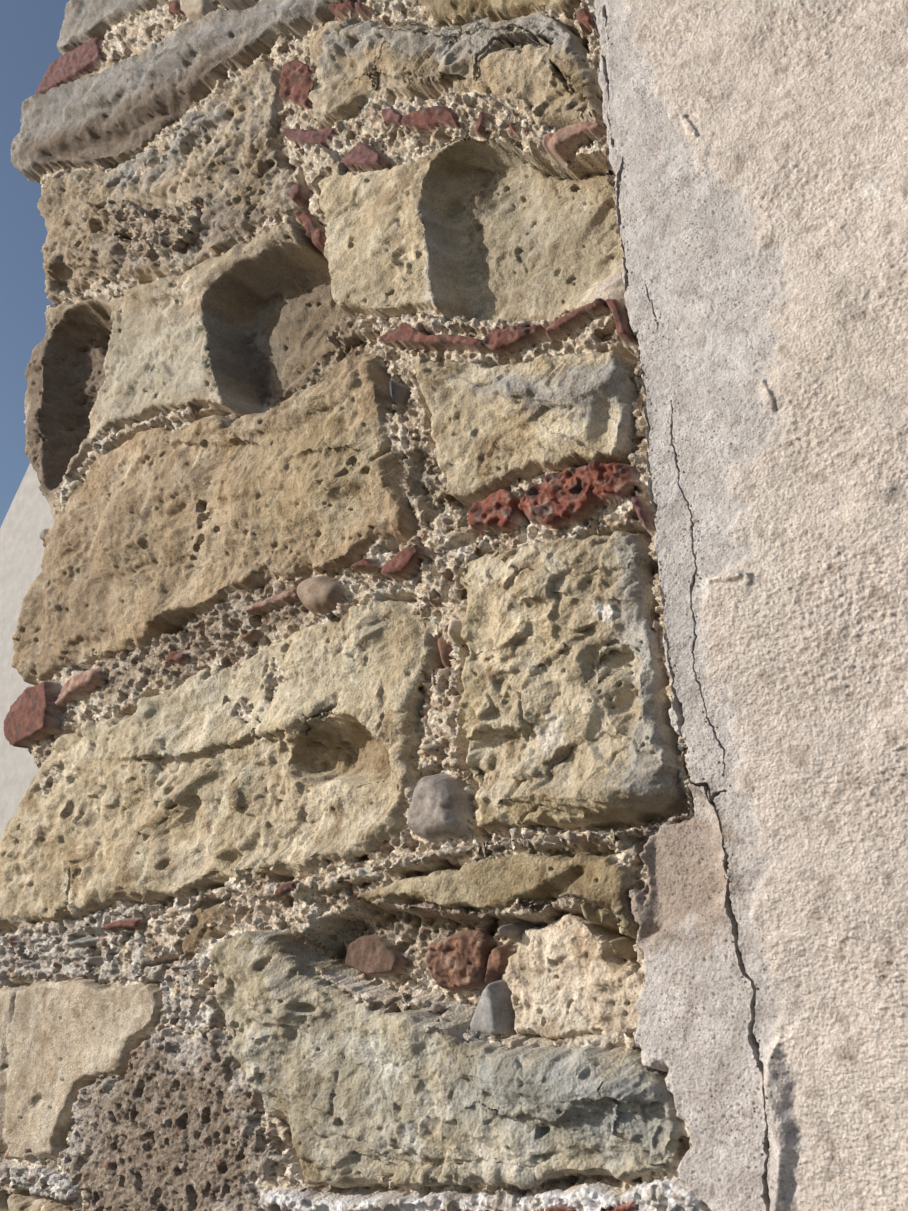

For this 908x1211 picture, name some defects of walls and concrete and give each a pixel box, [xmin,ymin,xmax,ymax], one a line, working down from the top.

crack [594,7,770,1211]